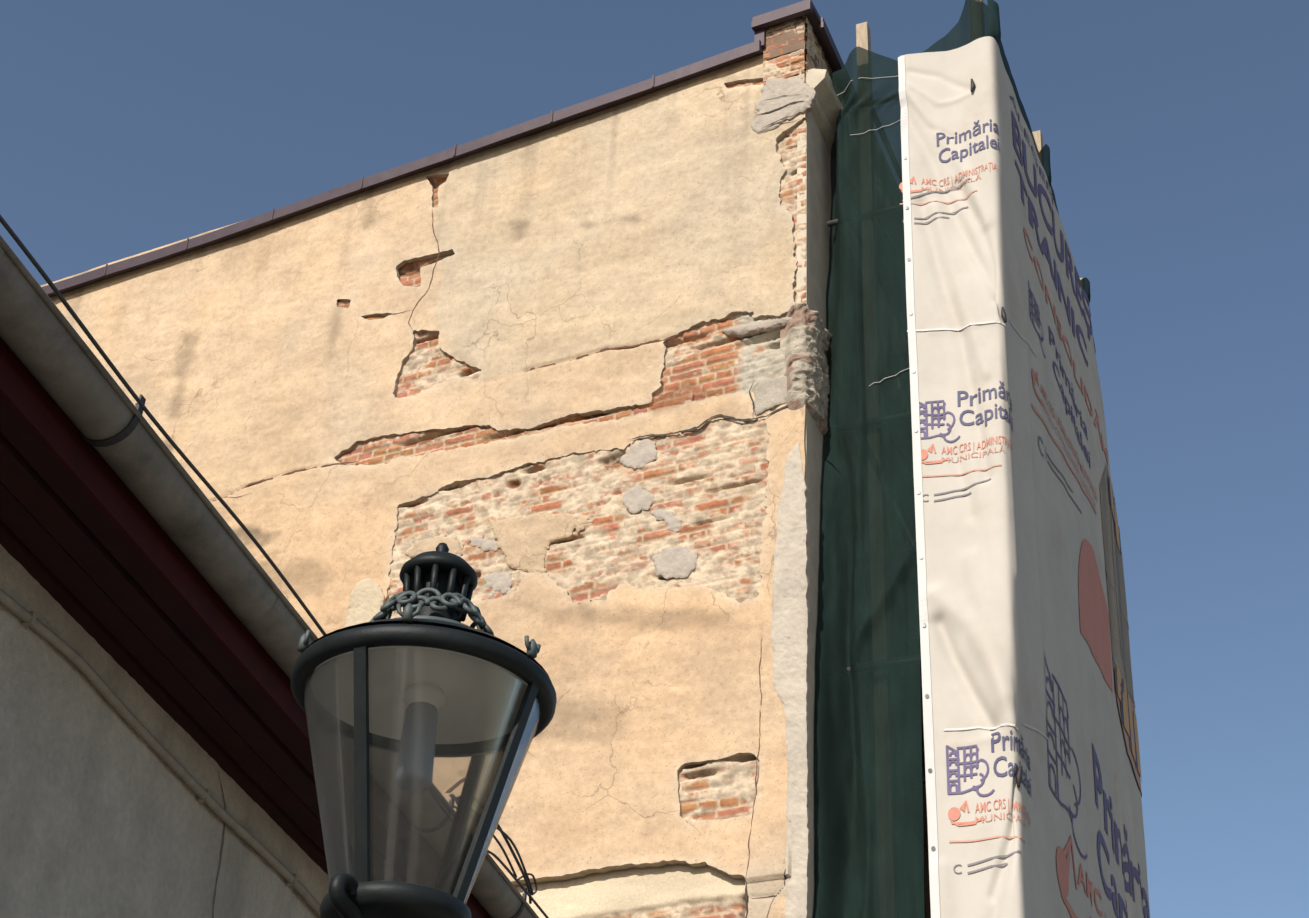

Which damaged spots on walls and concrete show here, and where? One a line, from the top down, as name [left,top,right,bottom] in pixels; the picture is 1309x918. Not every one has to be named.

crack [383,212,440,327]
spalling [336,115,806,619]
crack [214,460,360,501]
spalling [679,755,760,824]
spalling [515,864,749,918]